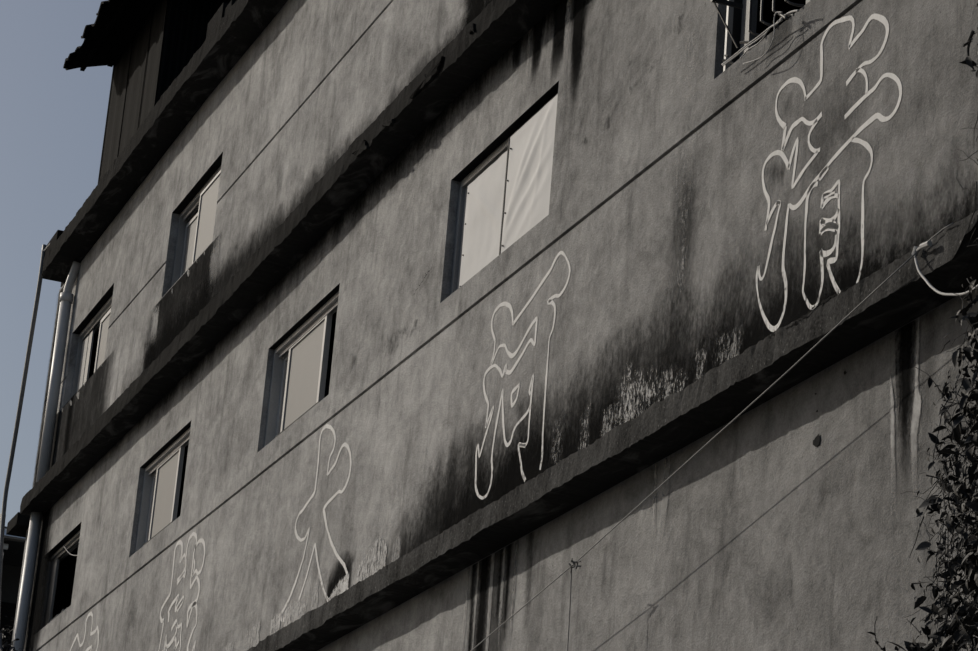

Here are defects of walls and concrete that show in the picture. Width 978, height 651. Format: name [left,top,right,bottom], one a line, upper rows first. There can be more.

damp [113,0,590,447]
damp [399,198,977,558]
damp [224,538,388,651]
damp [468,531,534,651]